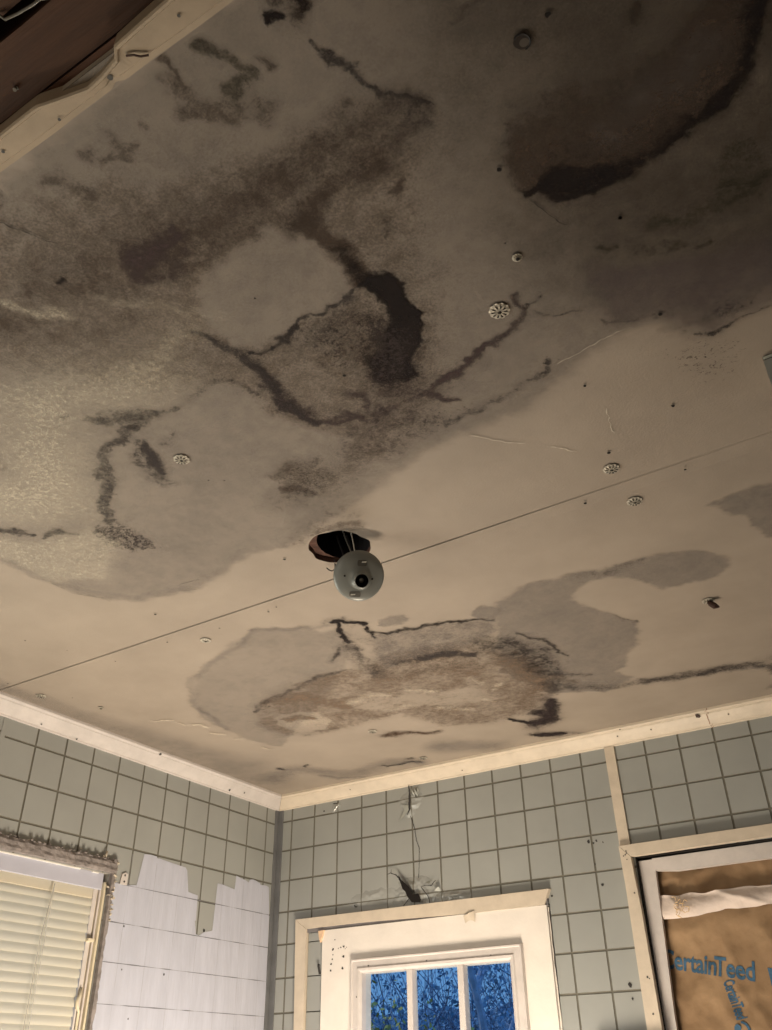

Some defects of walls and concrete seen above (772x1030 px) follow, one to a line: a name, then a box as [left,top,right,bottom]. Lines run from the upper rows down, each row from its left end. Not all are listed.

leakage [263,0,312,25]
leakage [506,0,768,202]
leakage [0,39,529,455]
leakage [0,528,74,539]
leakage [83,407,179,552]
leakage [253,608,577,738]
leakage [618,663,772,689]